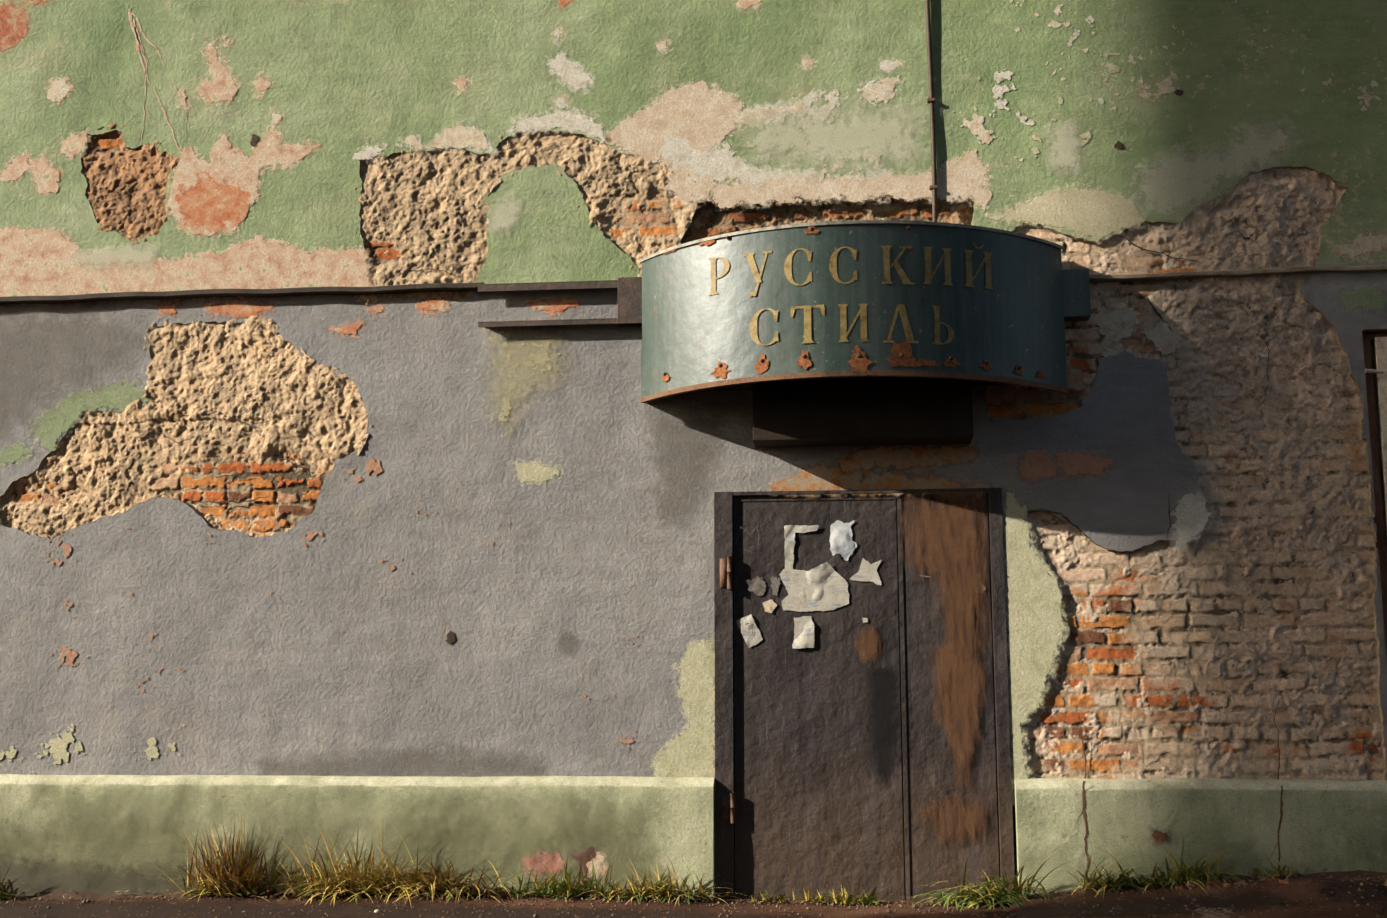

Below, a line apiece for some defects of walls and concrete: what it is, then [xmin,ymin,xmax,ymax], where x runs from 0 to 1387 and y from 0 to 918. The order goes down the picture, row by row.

spalling [0,0,1211,566]
spalling [986,168,1387,780]
peeling [50,646,88,670]
spalling [522,847,606,892]
flaking render [653,640,715,784]
crack [1075,712,1090,883]
crack [1271,701,1283,870]